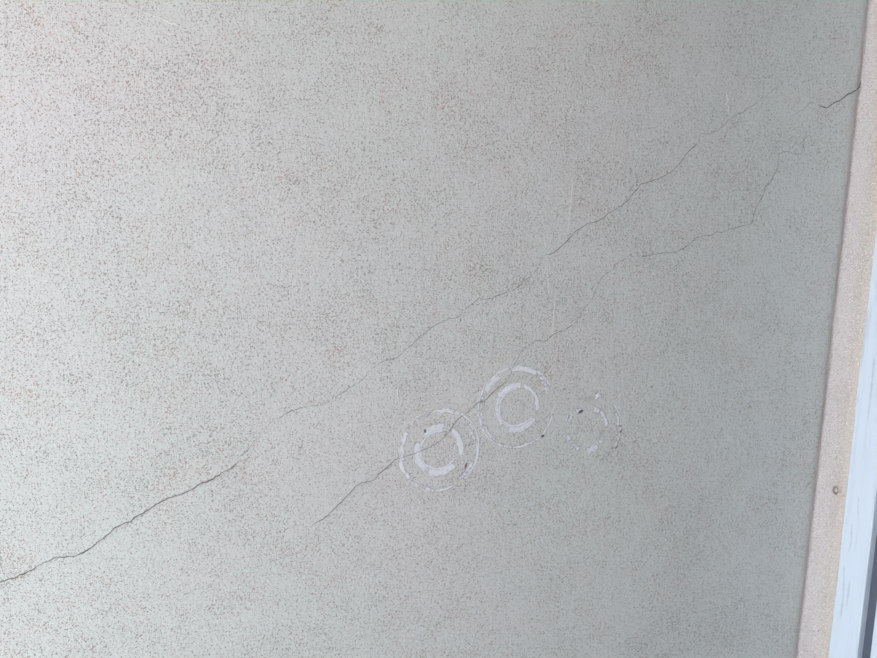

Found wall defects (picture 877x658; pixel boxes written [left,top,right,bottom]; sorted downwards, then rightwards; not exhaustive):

crack [1,85,806,582]
crack [795,83,861,115]